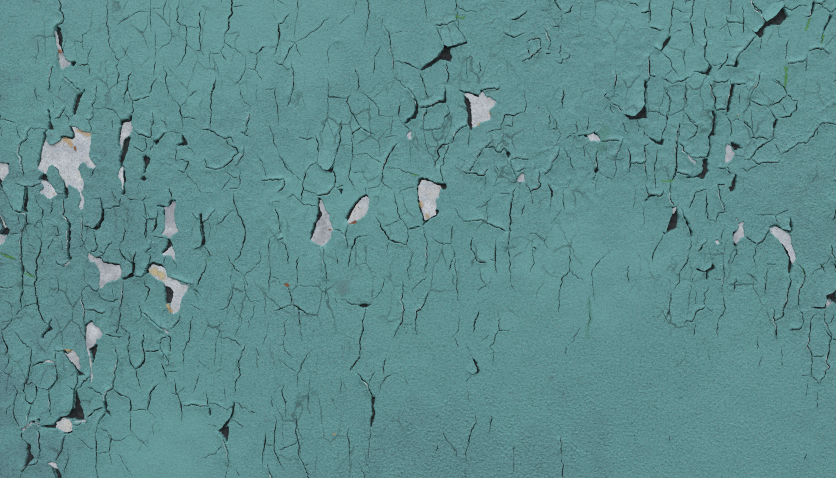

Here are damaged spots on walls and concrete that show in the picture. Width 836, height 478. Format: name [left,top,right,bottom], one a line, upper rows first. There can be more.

peeling [752,1,786,38]
peeling [462,91,496,130]
peeling [38,126,104,230]
peeling [44,321,121,433]
peeling [88,253,135,288]
peeling [147,200,191,314]
crack [0,0,589,478]
peeling [417,178,446,224]
crack [558,246,605,353]
crack [583,0,836,334]
peeling [760,210,796,273]
crack [757,245,836,406]